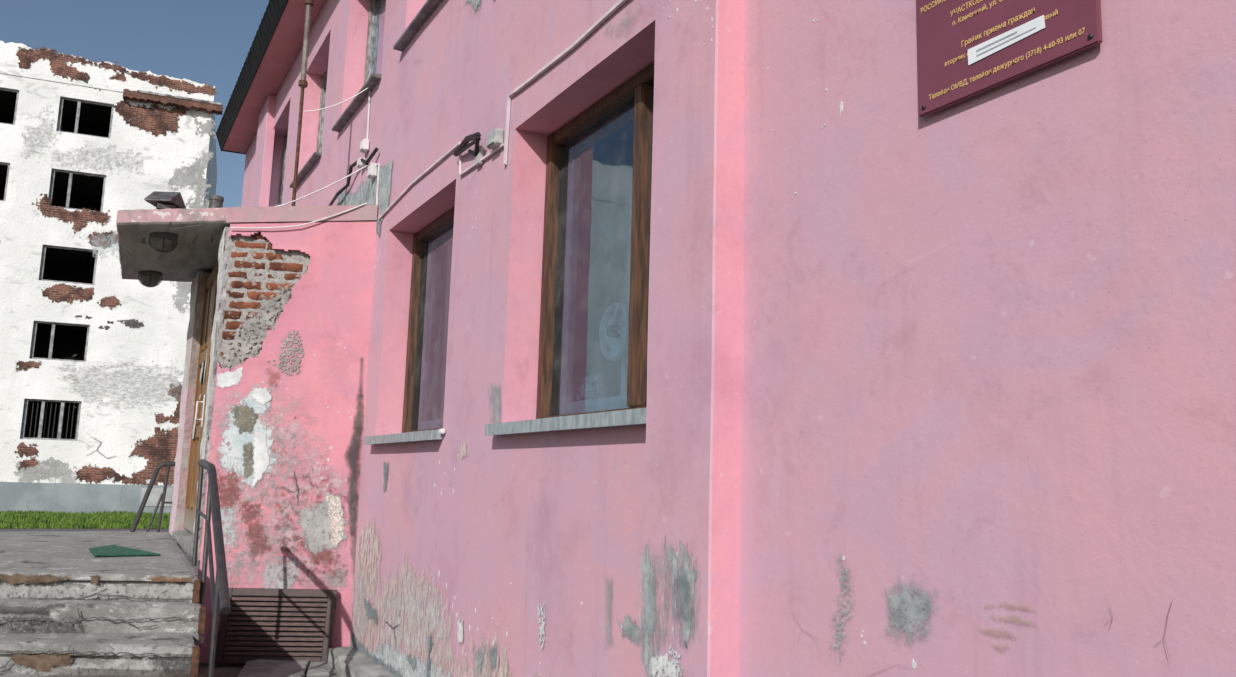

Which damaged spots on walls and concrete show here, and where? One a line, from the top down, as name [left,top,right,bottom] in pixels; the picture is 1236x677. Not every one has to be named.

flaking render [16,46,217,96]
flaking render [114,100,220,209]
flaking render [32,194,118,257]
peeling [337,161,393,239]
flaking render [41,283,144,330]
flaking render [172,282,191,313]
flaking render [14,359,182,486]
water stain [347,395,363,574]
flaking render [216,222,508,677]
peeling [0,583,194,603]
peeling [620,538,697,677]
peeling [11,651,192,677]